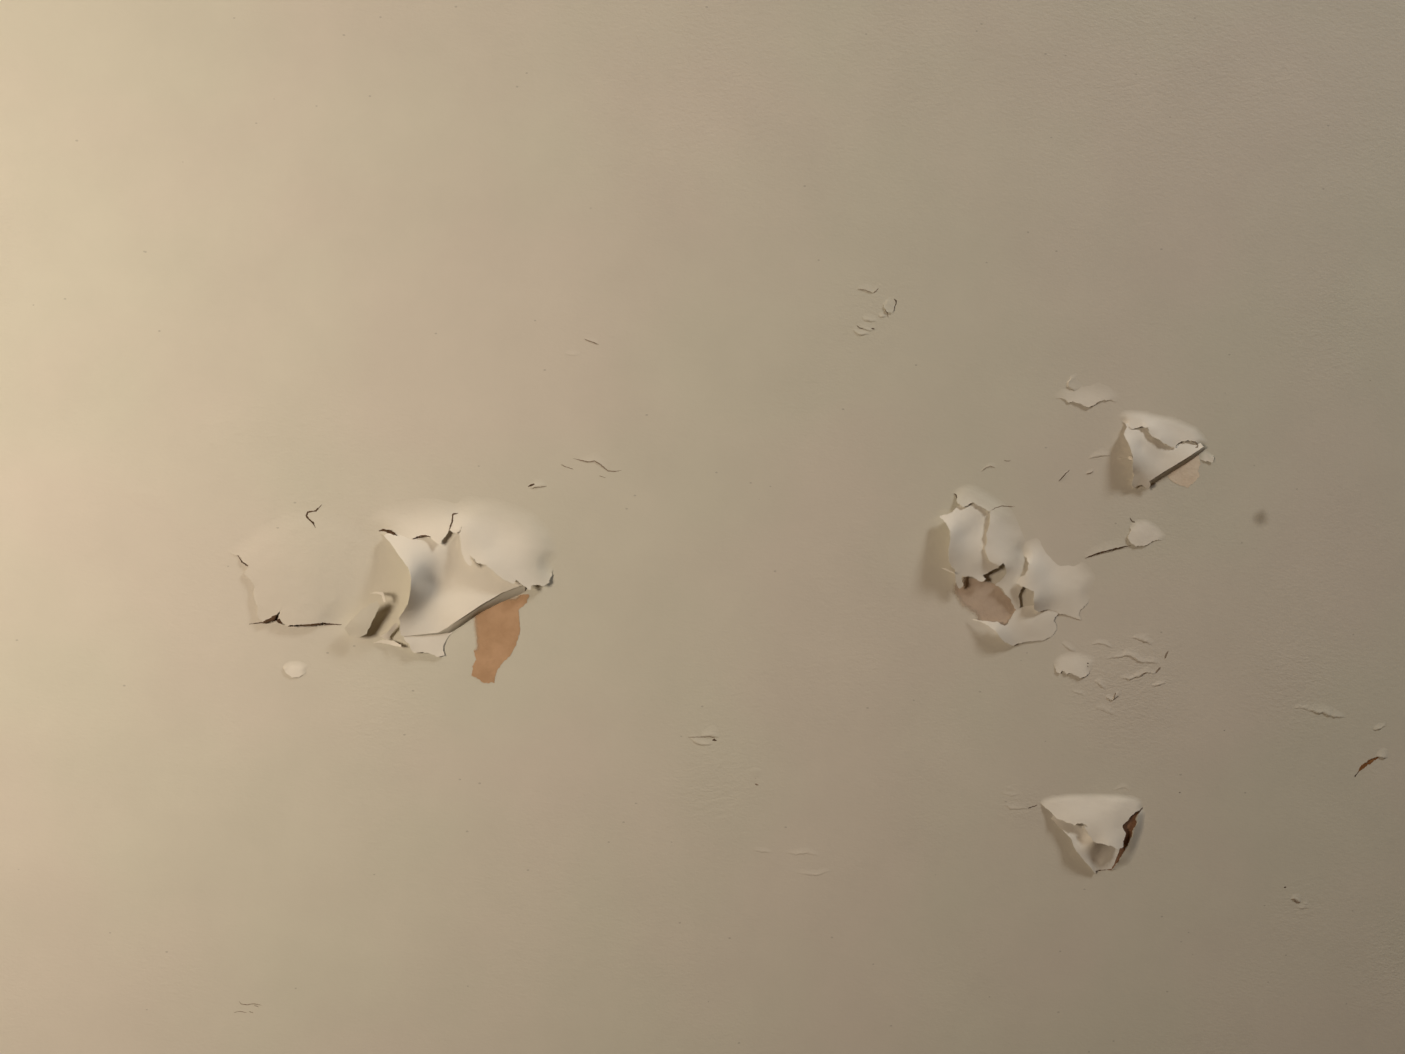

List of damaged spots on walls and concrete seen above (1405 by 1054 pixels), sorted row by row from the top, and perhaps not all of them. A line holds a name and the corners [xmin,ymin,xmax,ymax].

peeling [1054,373,1214,489]
peeling [227,496,559,683]
peeling [940,484,1166,646]
peeling [1053,652,1095,678]
peeling [1029,782,1146,873]